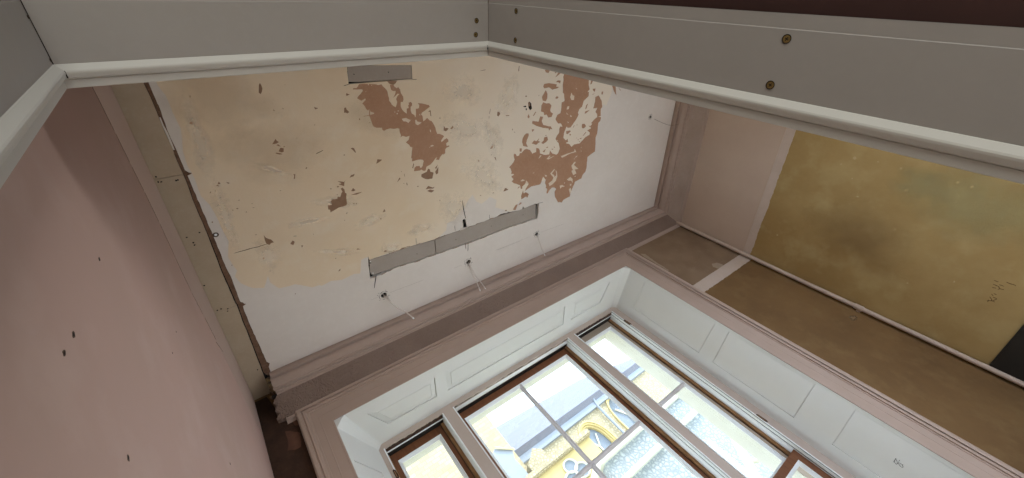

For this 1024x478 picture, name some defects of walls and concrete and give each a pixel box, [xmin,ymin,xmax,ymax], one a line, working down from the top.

peeling [144,56,616,478]